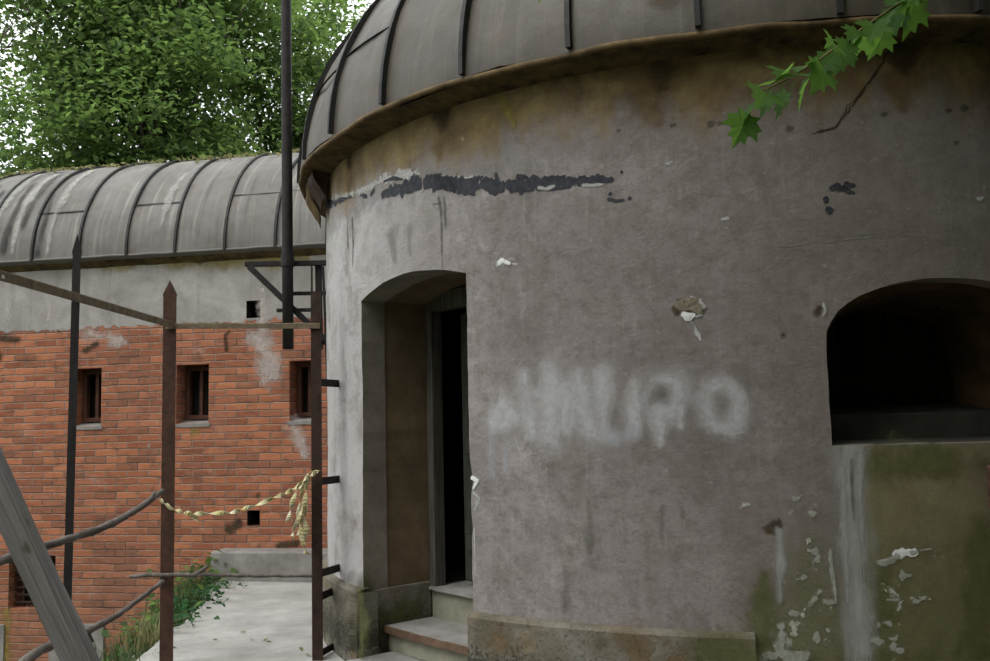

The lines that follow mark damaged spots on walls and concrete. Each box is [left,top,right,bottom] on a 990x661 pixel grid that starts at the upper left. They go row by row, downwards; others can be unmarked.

peeling [325,168,631,211]
leakage [248,288,278,382]
flaking render [672,296,706,341]
flaking render [764,519,782,535]
flaking render [759,538,837,661]
leakage [836,446,873,661]
flaking render [869,548,932,661]